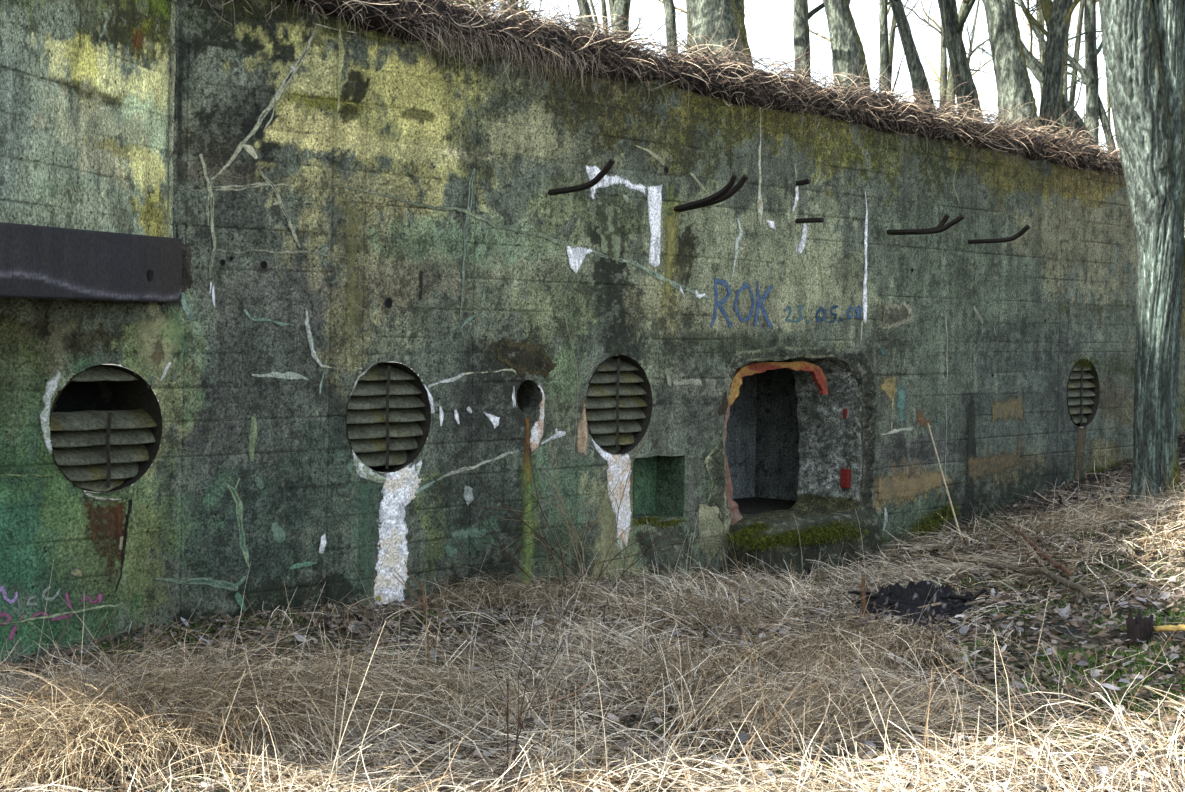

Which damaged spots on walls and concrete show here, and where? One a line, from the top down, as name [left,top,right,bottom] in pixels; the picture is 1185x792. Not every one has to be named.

crack [179,23,361,308]
leakage [40,312,84,454]
corrosion [85,497,126,573]
crack [244,309,362,395]
leakage [352,449,423,608]
corrosion [523,417,531,482]
leakage [591,439,651,580]
spalling [629,345,943,581]